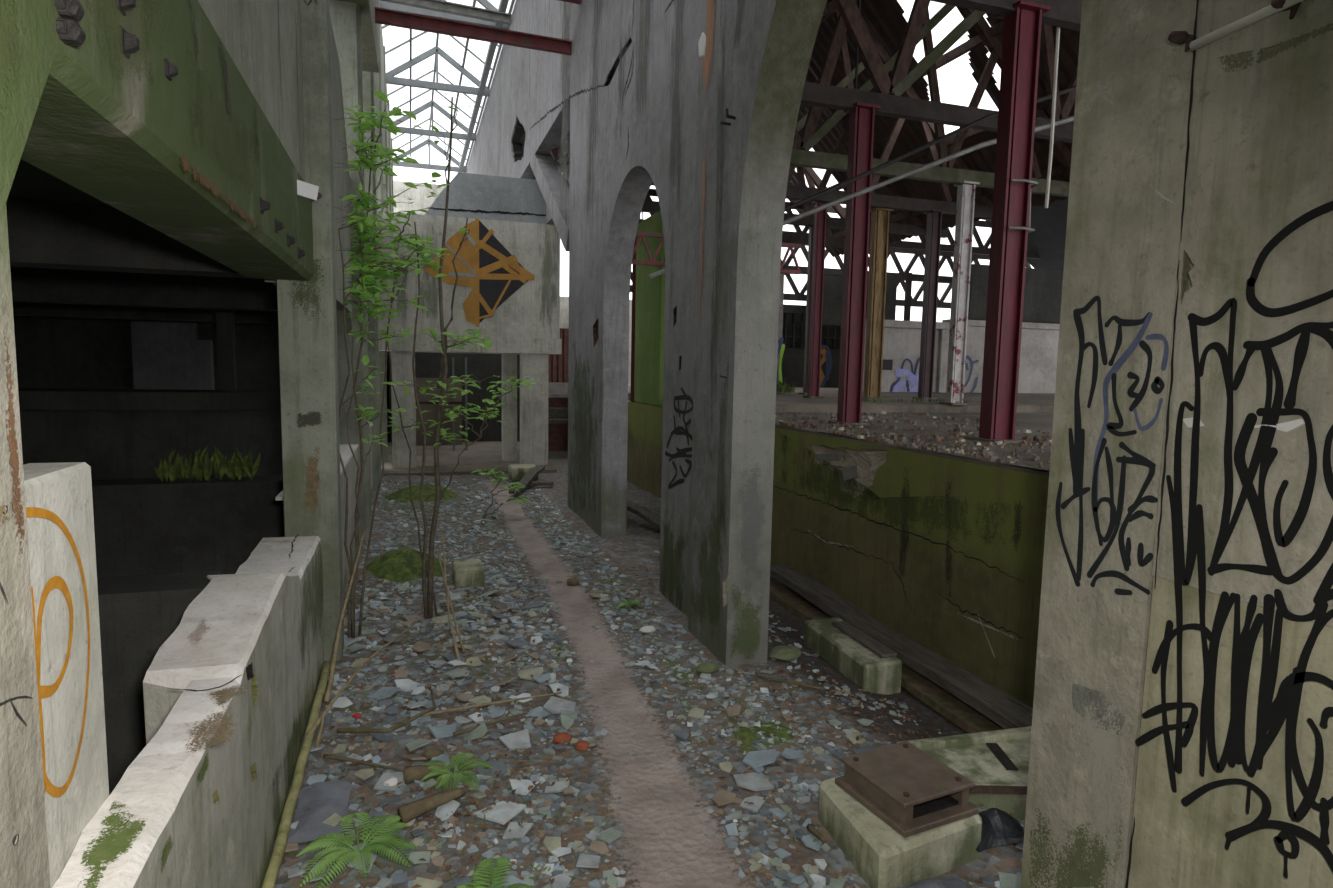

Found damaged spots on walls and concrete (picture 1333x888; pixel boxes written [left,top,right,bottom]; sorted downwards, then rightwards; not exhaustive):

water stain [539,2,571,333]
water stain [584,0,653,218]
water stain [668,0,686,229]
corrosion [698,0,715,327]
crack [1155,0,1199,587]
spalling [246,662,258,707]
spalling [810,445,889,498]
crack [773,485,1024,606]
crack [941,595,1020,638]
crack [1125,817,1135,888]